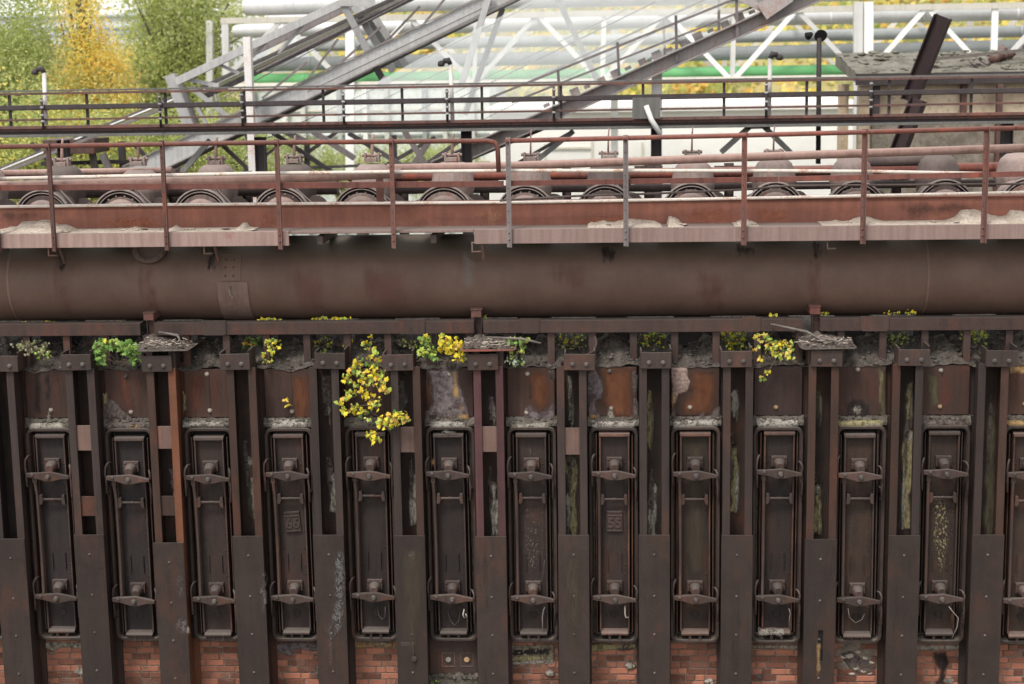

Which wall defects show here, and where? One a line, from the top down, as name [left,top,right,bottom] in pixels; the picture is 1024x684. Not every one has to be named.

peeling [426,370,470,427]
peeling [587,370,639,427]
spalling [671,366,690,419]
leakage [902,383,912,529]